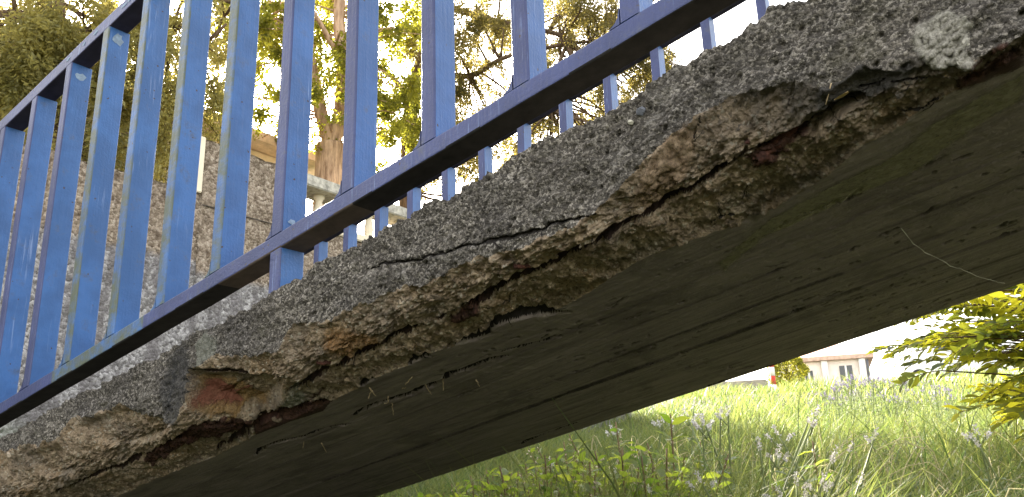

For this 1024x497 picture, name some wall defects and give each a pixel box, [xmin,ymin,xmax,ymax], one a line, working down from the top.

spalling [550,34,1024,280]
corrosion [144,374,332,466]
spalling [0,235,607,497]
crack [192,144,759,454]